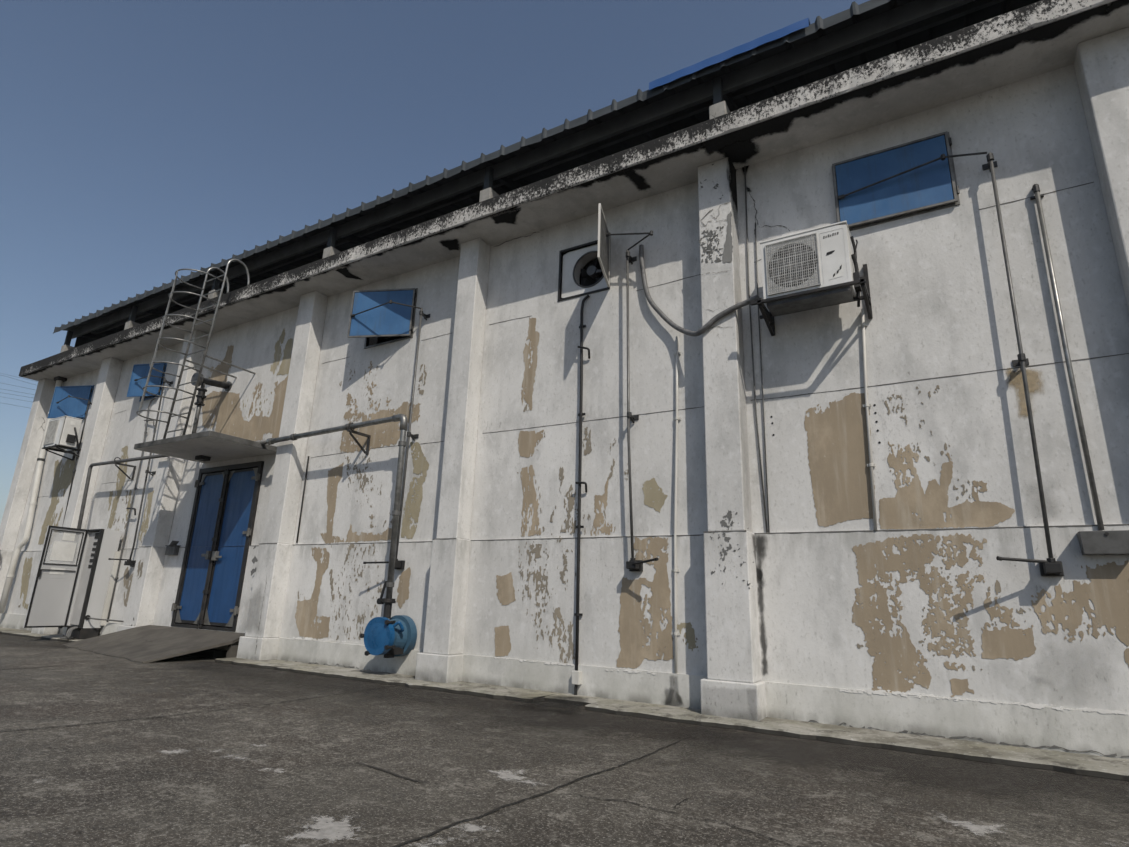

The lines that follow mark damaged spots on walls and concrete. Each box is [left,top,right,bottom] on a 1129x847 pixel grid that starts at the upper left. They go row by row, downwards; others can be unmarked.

mould [20,0,1129,377]
flaking render [722,211,733,263]
peeling [202,329,293,441]
peeling [521,317,539,412]
peeling [18,557,33,609]
peeling [38,458,75,545]
peeling [292,361,429,643]
peeling [494,426,628,667]
peeling [606,537,698,675]
damp [706,510,767,674]
peeling [804,385,1129,715]